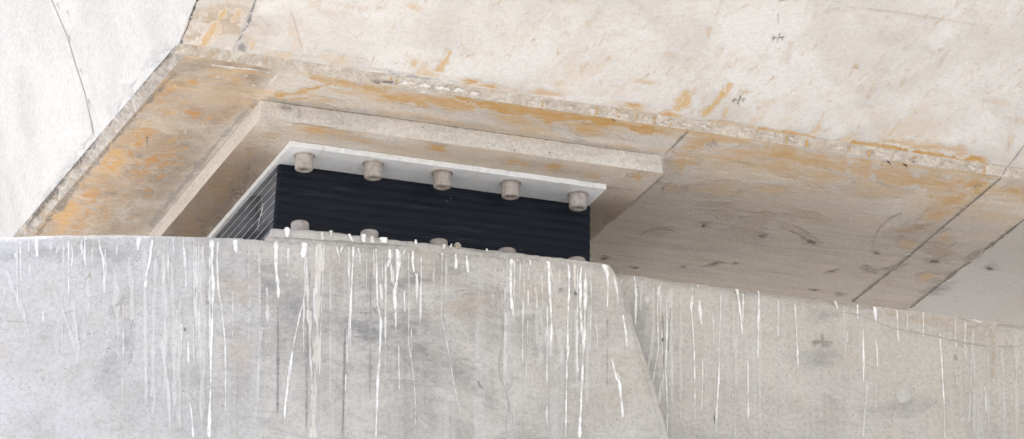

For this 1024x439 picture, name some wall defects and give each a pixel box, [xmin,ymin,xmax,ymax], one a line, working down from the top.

rust [45,0,1024,237]
leakage [0,54,763,439]
leakage [777,300,1020,438]